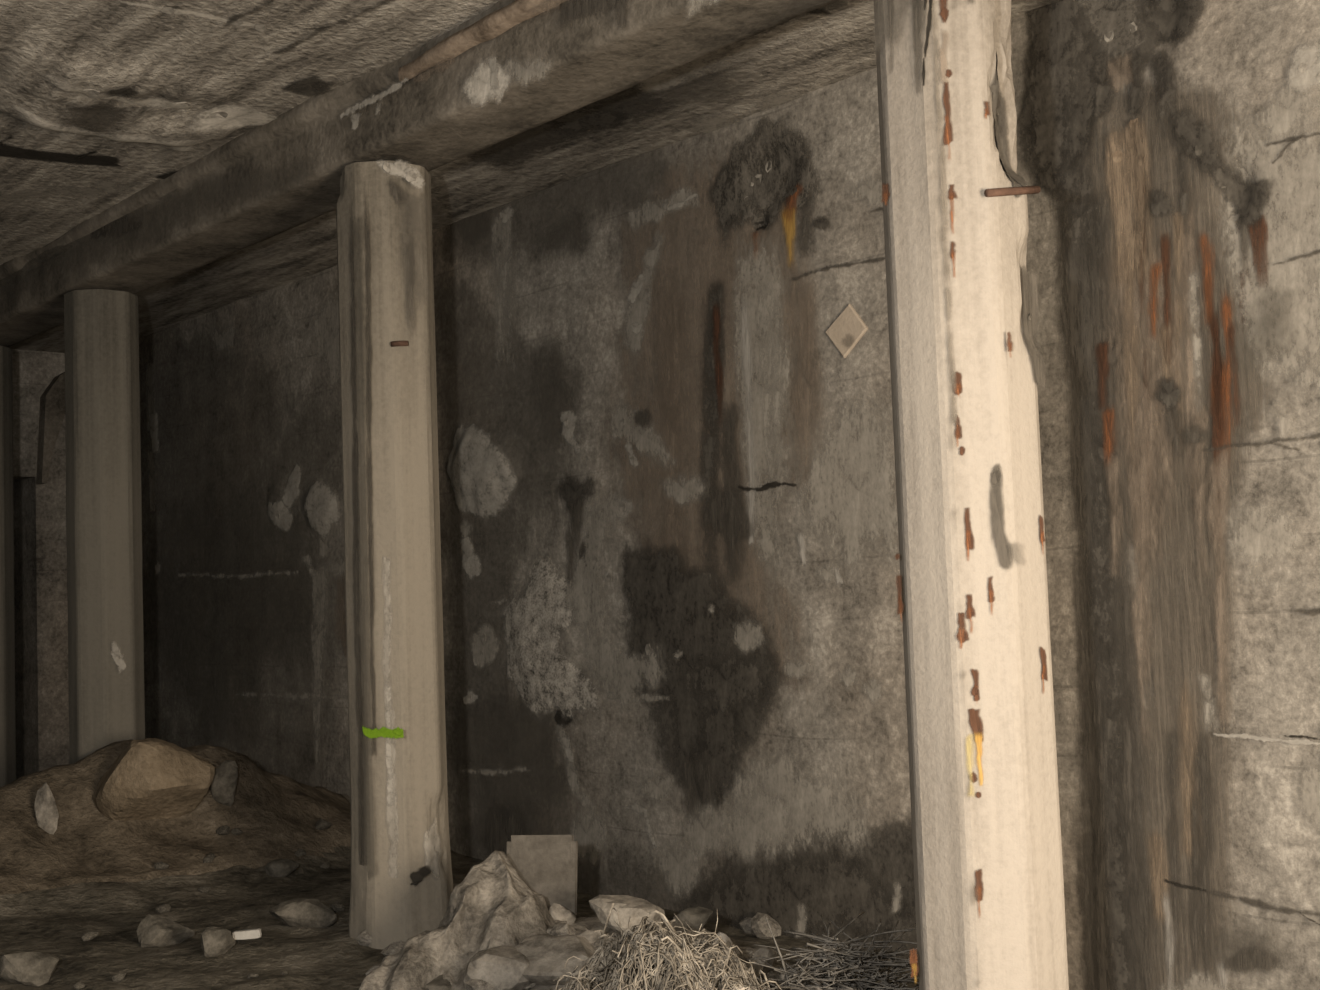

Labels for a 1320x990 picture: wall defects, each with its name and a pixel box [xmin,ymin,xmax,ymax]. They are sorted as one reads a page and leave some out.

rust [940,0,953,145]
crack [1266,133,1320,164]
crack [793,258,885,281]
crack [1205,434,1320,451]
damp [619,158,918,965]
rust [965,508,974,558]
damp [990,465,1013,568]
damp [1019,0,1320,990]
rust [957,595,975,648]
rust [967,669,983,798]
damp [559,727,607,865]
crack [1165,879,1320,925]